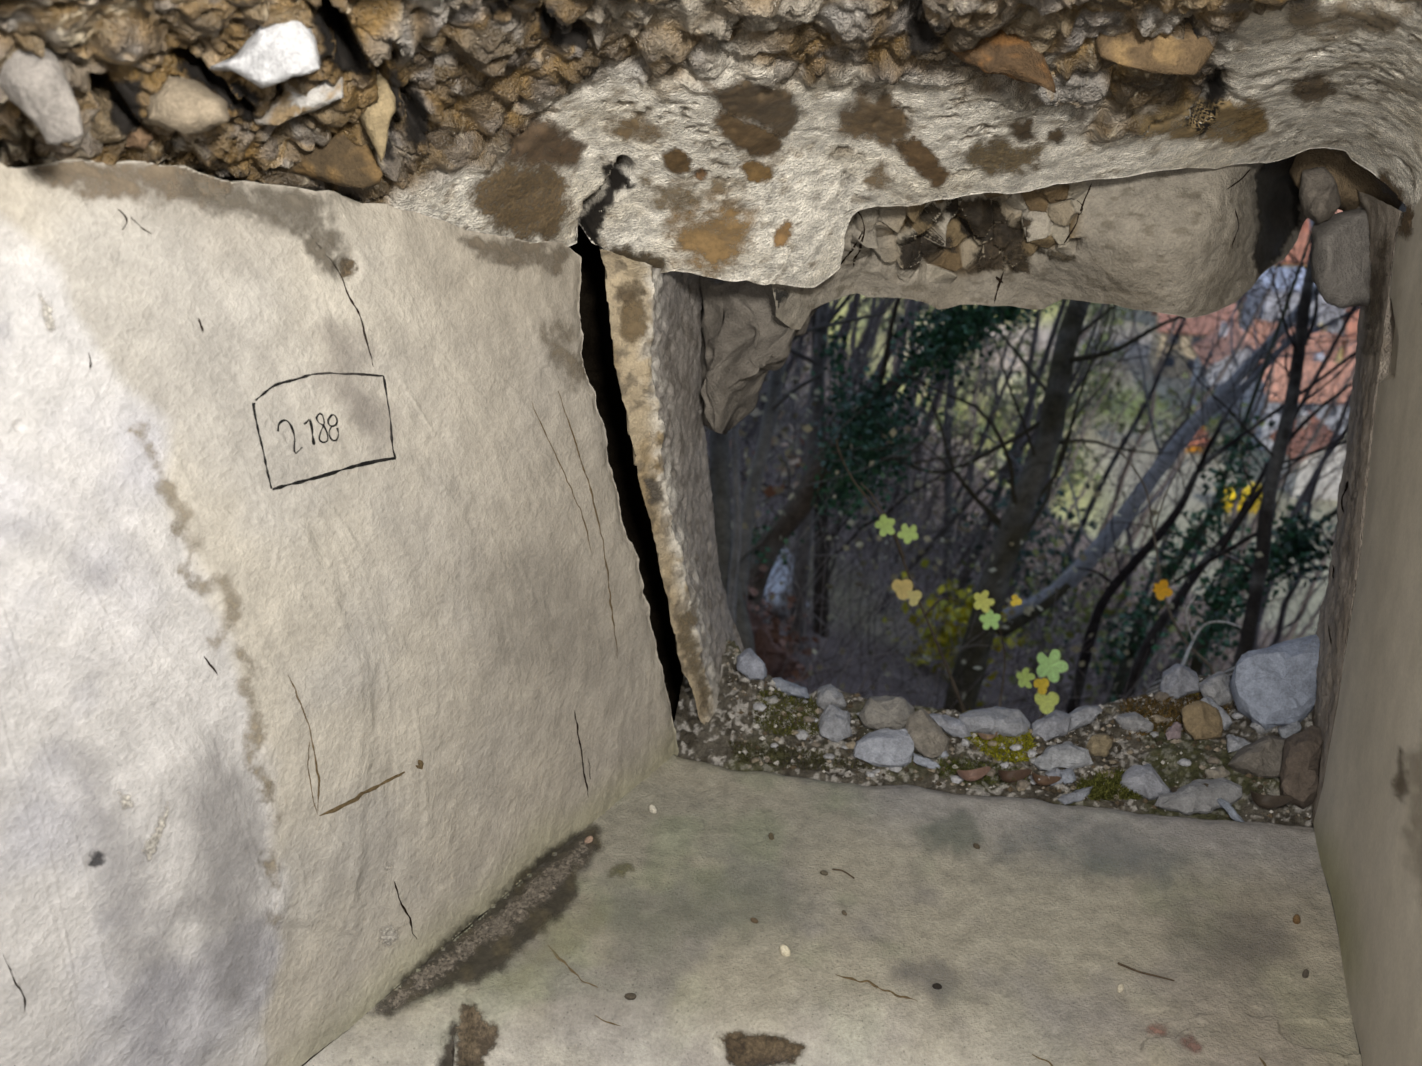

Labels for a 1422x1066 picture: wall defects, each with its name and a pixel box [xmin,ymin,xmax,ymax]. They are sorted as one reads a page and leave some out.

water stain [611,118,725,210]
water stain [704,80,799,138]
water stain [838,86,950,189]
water stain [1047,128,1065,144]
water stain [466,236,569,276]
water stain [610,244,665,272]
crack [532,224,684,724]
spalling [455,1004,498,1066]
spalling [721,1031,805,1066]